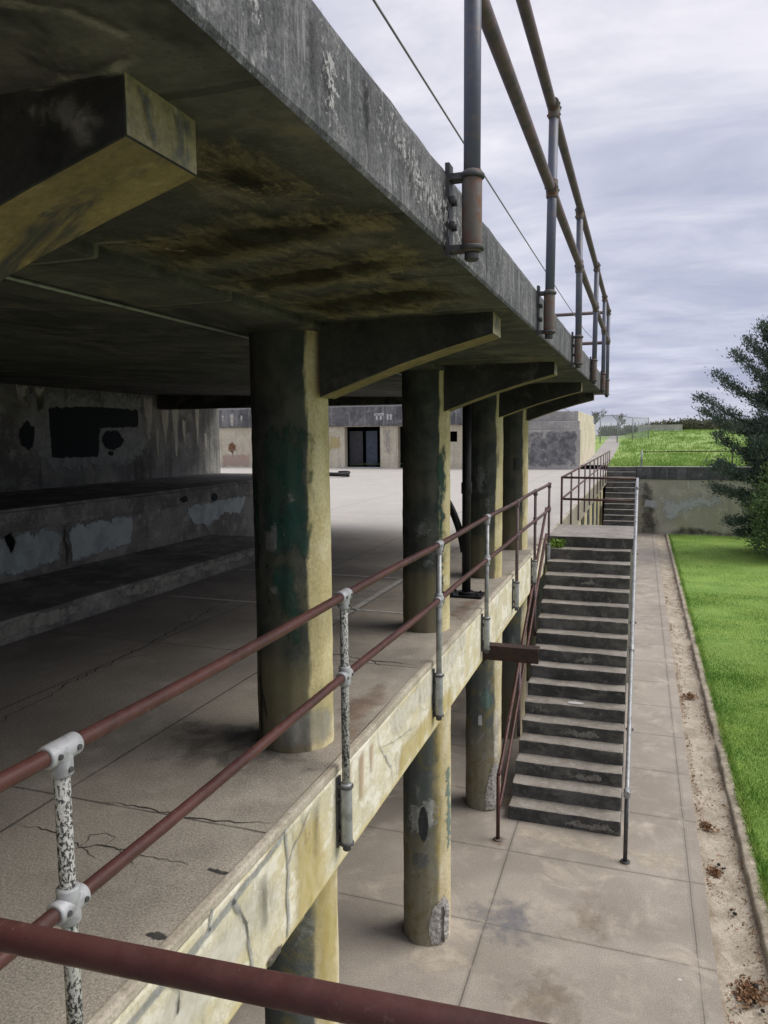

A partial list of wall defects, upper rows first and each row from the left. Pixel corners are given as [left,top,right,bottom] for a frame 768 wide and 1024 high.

damp [127,150,454,320]
peeling [0,515,133,576]
peeling [119,427,313,644]
spalling [478,689,499,810]
crack [18,824,185,864]
crack [108,802,309,967]
peeling [408,766,451,847]
spalling [429,896,450,945]
crack [128,986,180,1024]